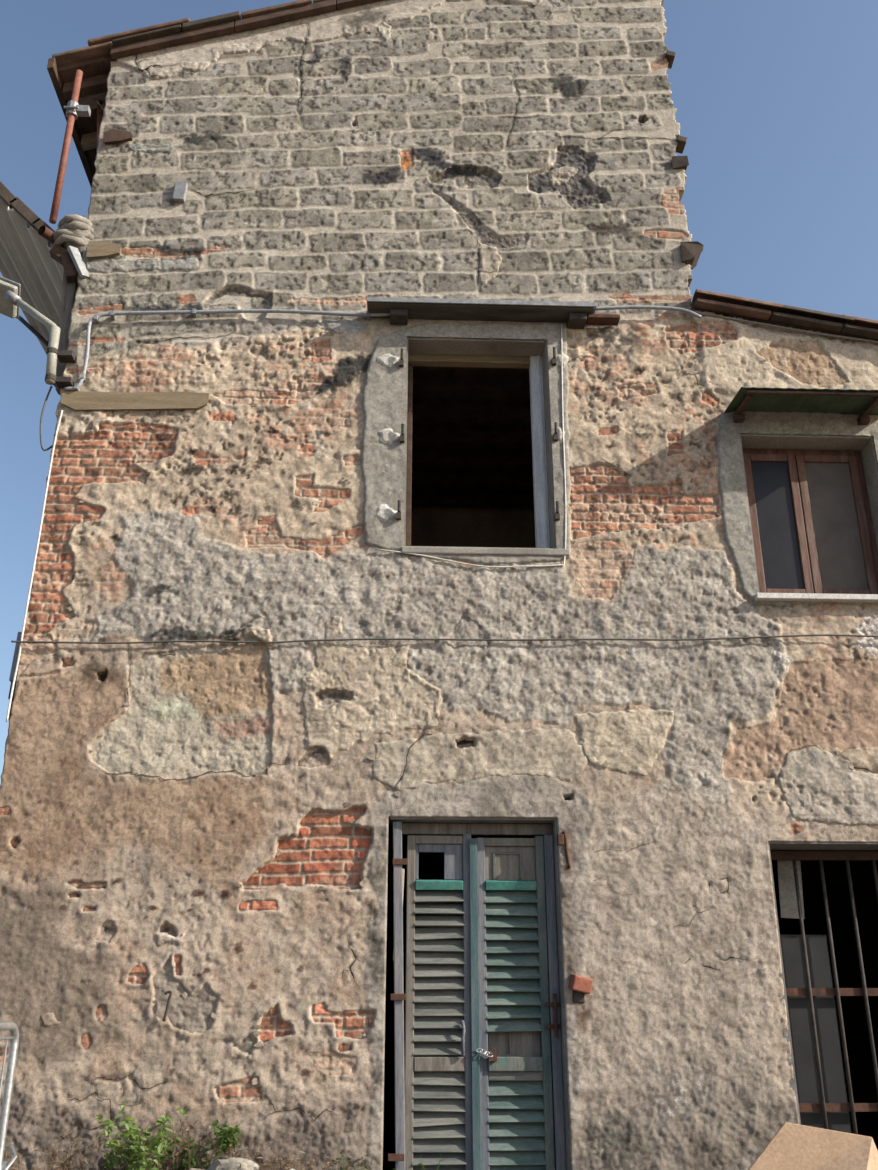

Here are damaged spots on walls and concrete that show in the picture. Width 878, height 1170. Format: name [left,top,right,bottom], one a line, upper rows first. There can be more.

crack [298,25,314,126]
water stain [549,73,589,98]
water stain [364,167,400,187]
water stain [411,147,481,178]
water stain [316,353,372,400]
spalling [15,423,178,689]
spalling [171,448,363,558]
spalling [569,464,722,602]
peeling [89,644,272,779]
spalling [221,802,372,911]
crack [57,1070,165,1142]
crack [262,1093,341,1133]